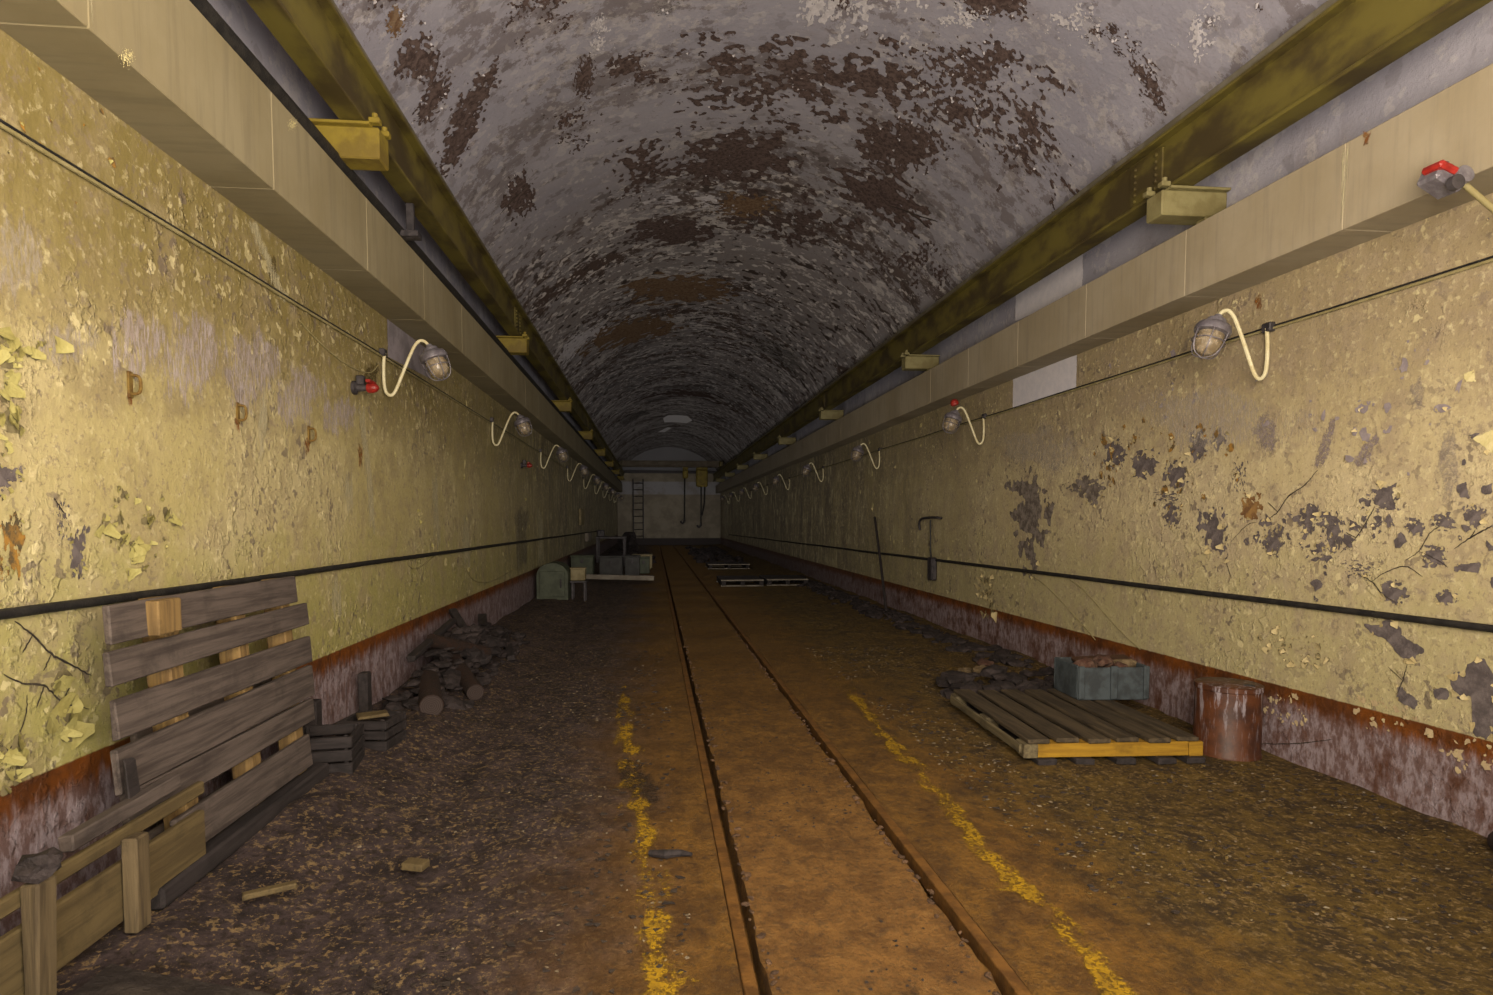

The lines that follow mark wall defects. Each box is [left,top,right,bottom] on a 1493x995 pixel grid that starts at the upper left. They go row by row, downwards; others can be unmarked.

water stain [556,322,608,369]
peeling [0,326,74,580]
peeling [53,486,183,582]
peeling [1004,382,1493,670]
peeling [46,667,95,751]
peeling [1263,694,1307,726]
peeling [1353,656,1493,774]